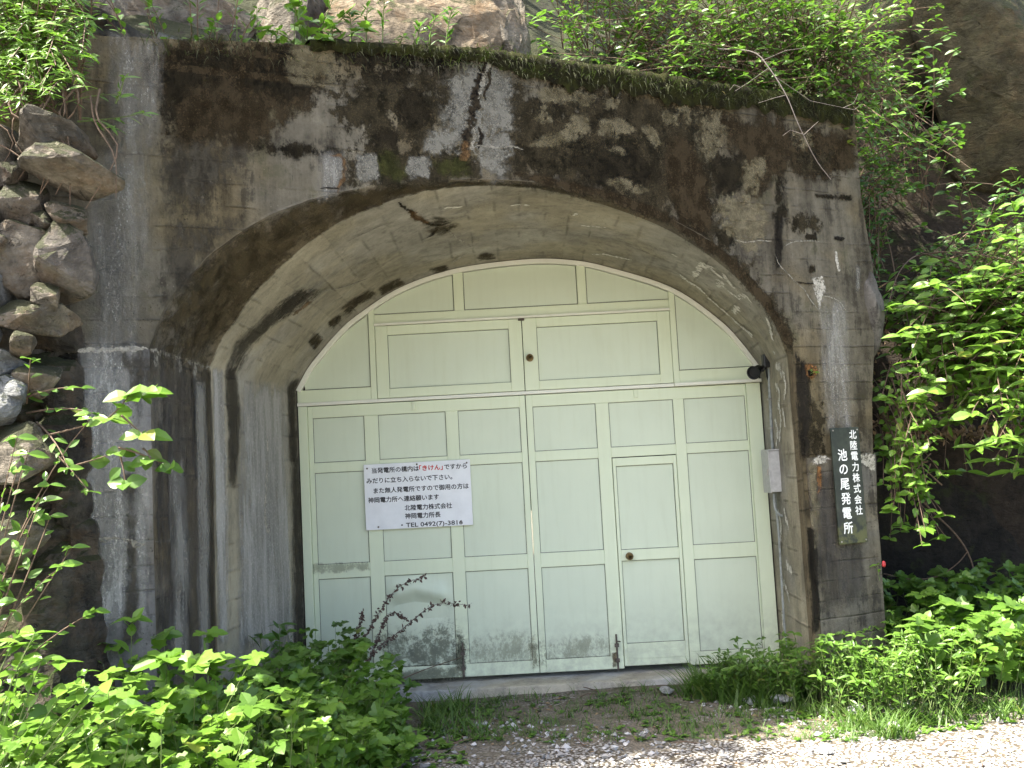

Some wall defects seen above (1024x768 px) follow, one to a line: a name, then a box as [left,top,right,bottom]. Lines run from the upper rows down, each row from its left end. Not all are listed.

crack [460,49,523,161]
crack [349,202,475,248]
water stain [45,35,858,653]
water stain [861,453,875,470]